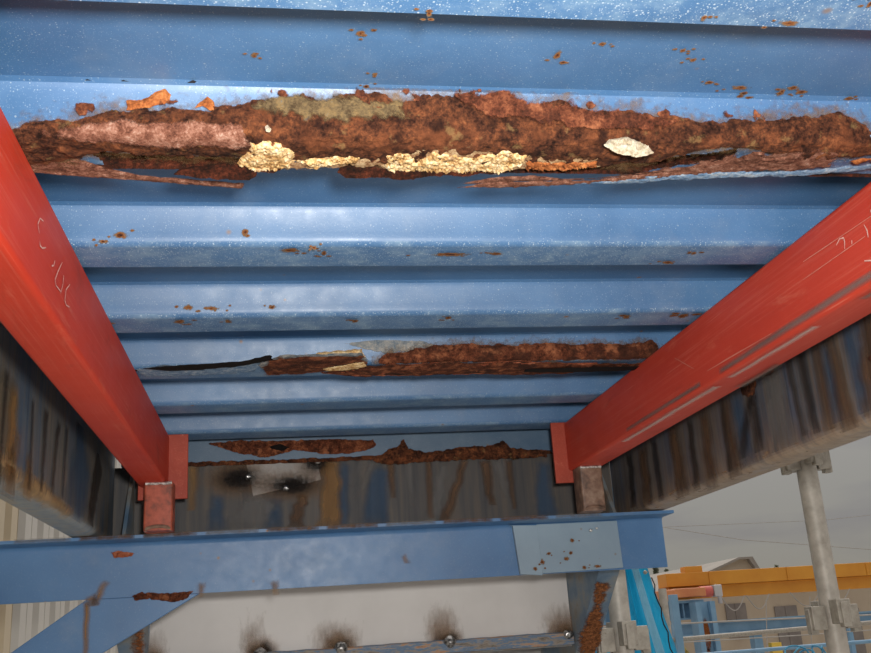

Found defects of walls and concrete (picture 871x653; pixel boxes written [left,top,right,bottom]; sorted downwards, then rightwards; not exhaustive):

peeling [195,96,215,111]
corrosion [11,72,871,169]
peeling [337,148,802,184]
spalling [808,158,871,177]
corrosion [374,339,659,364]
corrosion [188,439,552,531]
corrosion [132,586,202,602]
corrosion [577,582,611,653]
corrosion [132,630,145,653]